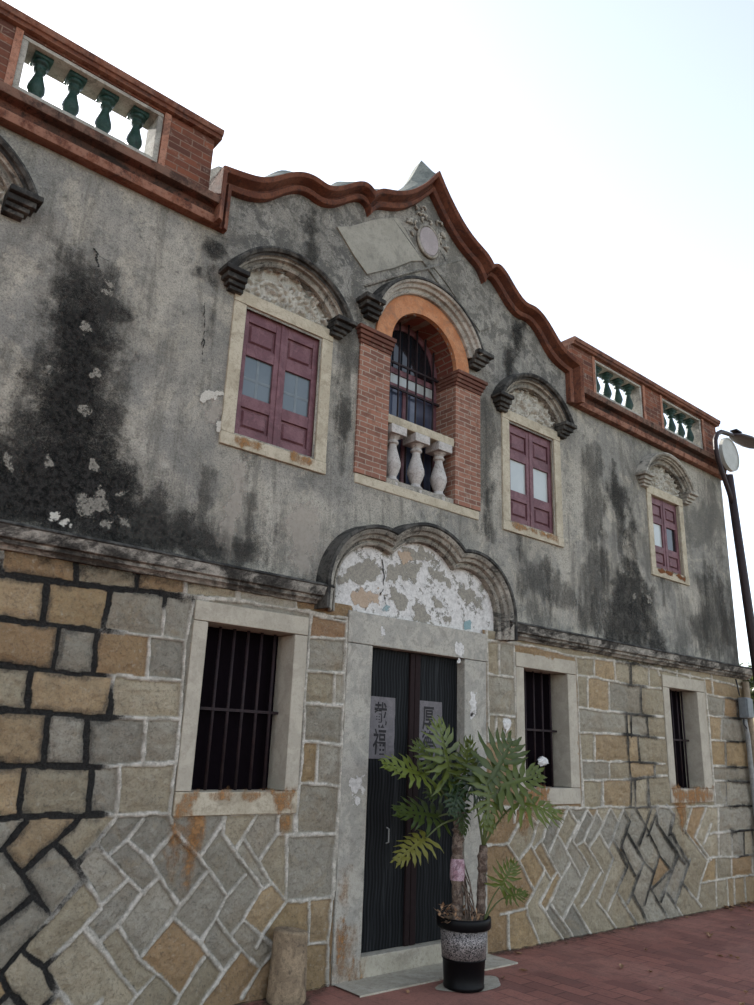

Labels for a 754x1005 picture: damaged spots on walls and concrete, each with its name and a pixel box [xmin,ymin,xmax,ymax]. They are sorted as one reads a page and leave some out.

water stain [194,237,227,286]
water stain [0,246,273,570]
peeling [199,389,224,432]
water stain [648,458,690,494]
spalling [49,485,130,529]
water stain [275,446,666,651]
peeling [335,543,493,636]
water stain [690,564,738,659]
peeling [455,641,464,663]
peeling [469,692,477,720]
corrosion [243,788,295,830]
corrosion [168,791,206,885]